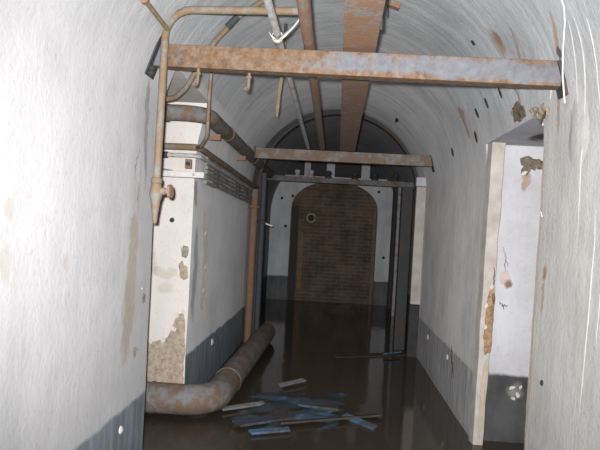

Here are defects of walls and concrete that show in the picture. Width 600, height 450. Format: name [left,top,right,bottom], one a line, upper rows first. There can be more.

spalling [510,101,551,124]
spalling [520,156,543,190]
spalling [176,245,189,280]
peeling [483,267,495,355]
spalling [146,309,186,384]
peeling [478,365,488,432]